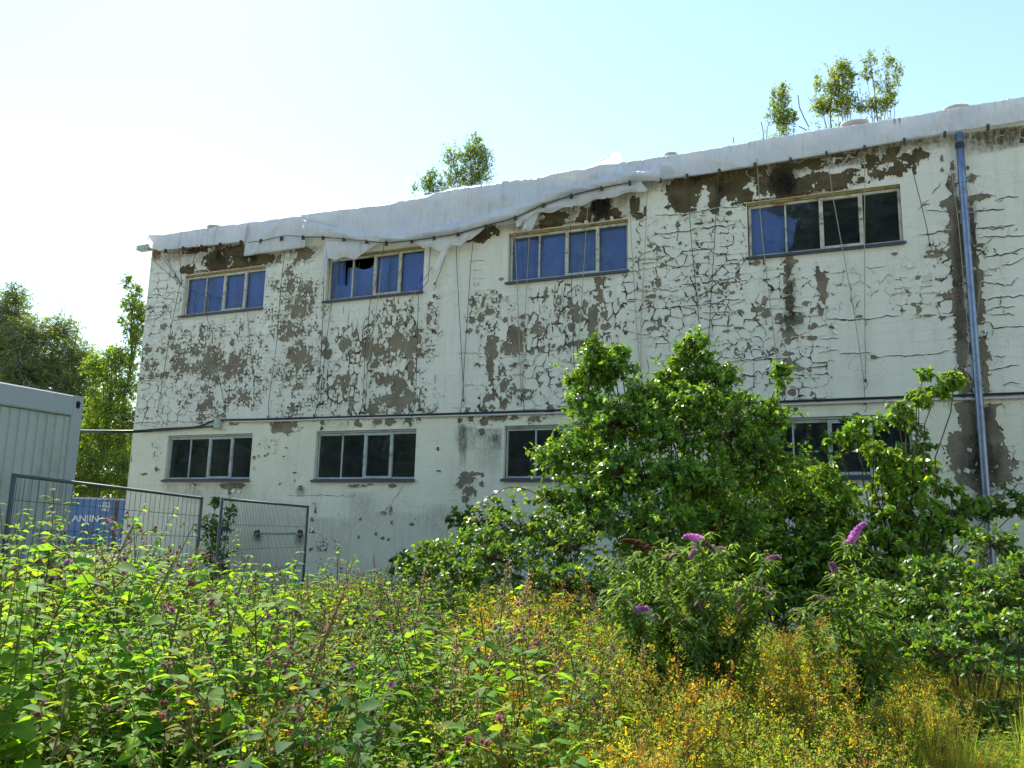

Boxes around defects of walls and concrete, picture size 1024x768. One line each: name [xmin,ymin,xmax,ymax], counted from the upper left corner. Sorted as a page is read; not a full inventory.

crack [917,183,950,235]
crack [144,263,189,346]
peeling [139,241,445,470]
peeling [457,275,630,436]
crack [620,198,776,389]
peeling [660,145,1024,504]
crack [819,266,949,357]
crack [969,195,1024,386]
crack [133,376,212,435]
peeling [219,482,247,498]
peeling [450,466,486,507]